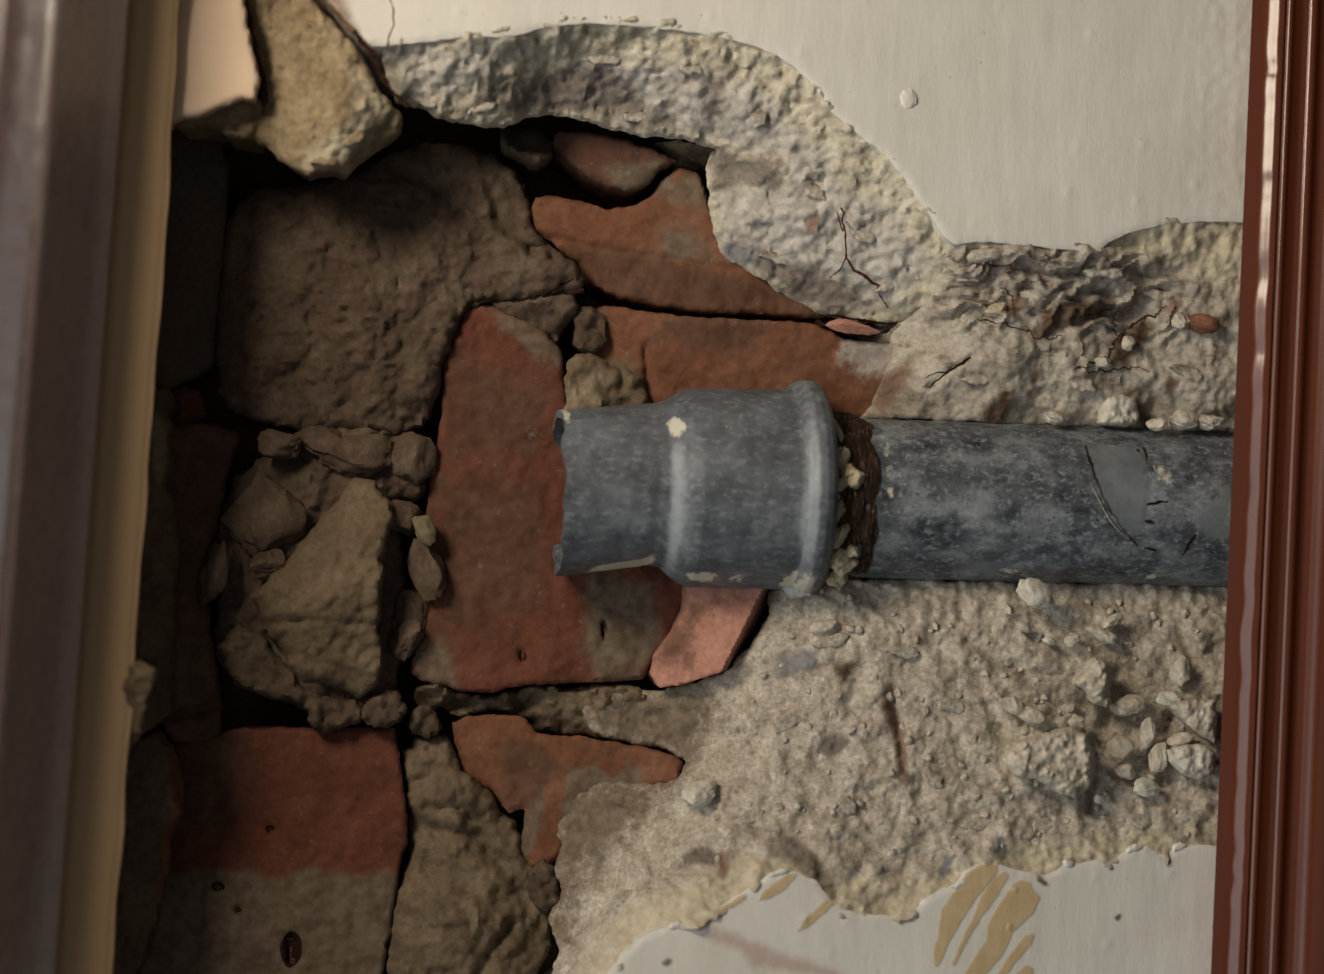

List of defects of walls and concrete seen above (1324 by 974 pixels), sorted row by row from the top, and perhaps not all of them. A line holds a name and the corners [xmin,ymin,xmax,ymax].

crack [244,0,270,106]
crack [322,0,409,108]
flaking render [174,0,1243,432]
spalling [250,478,395,699]
flaking render [548,579,1227,974]
spalling [280,931,302,967]